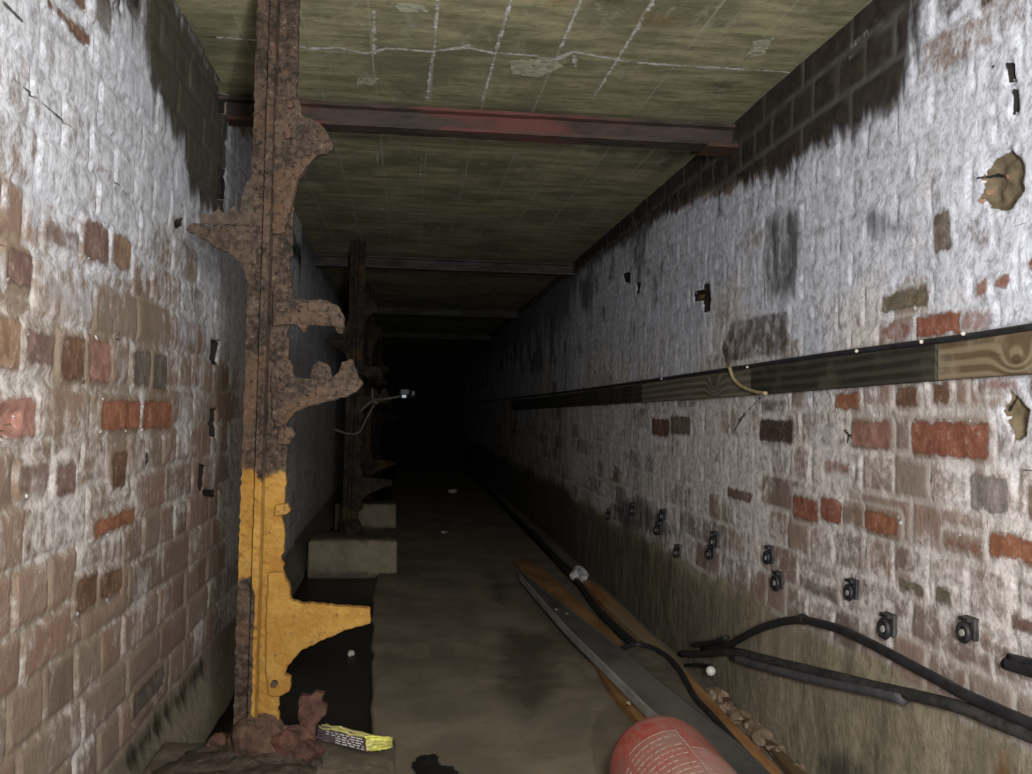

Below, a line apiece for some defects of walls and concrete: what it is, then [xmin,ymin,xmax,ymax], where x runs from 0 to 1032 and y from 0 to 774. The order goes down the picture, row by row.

leakage [103,0,228,212]
crack [210,34,257,42]
leakage [510,58,564,77]
crack [299,0,791,101]
leakage [577,0,921,266]
spalling [977,150,1026,211]
leakage [769,213,798,292]
peeling [835,391,890,449]
peeling [896,382,989,460]
spalling [993,383,1030,444]
peeling [970,473,1008,514]
leakage [127,656,203,768]